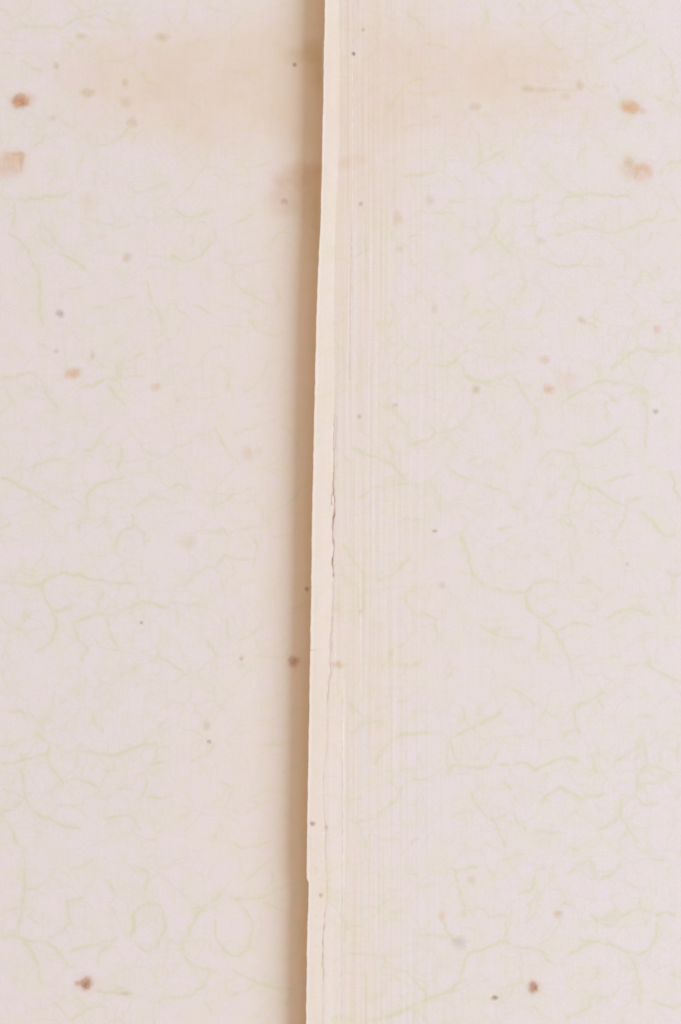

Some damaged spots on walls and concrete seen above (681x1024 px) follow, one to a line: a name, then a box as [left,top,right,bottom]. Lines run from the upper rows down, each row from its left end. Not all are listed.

crack [321,414,342,1024]